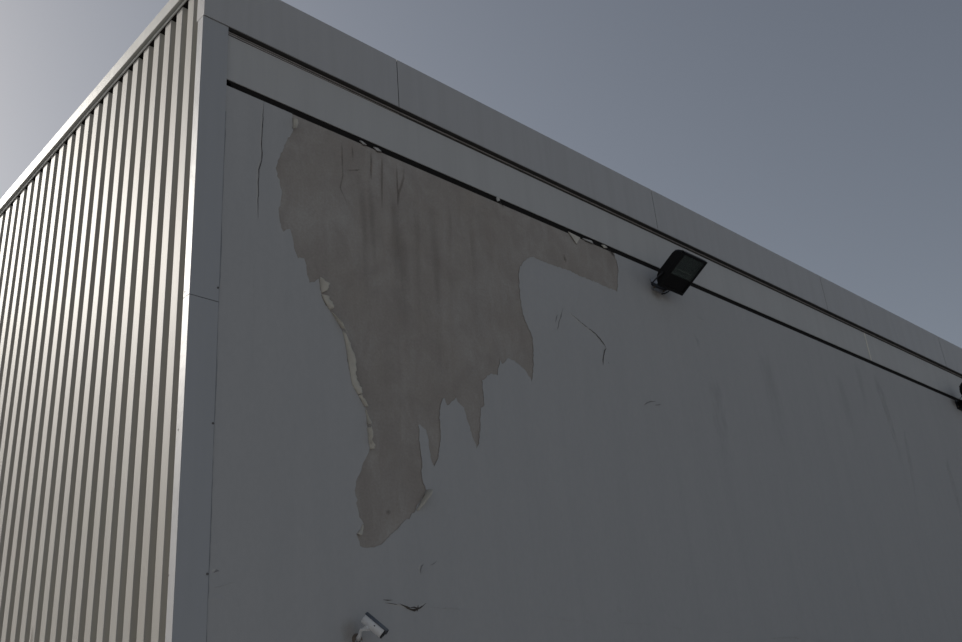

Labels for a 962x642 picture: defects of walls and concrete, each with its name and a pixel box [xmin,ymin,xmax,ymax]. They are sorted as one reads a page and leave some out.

peeling [274,114,619,548]
crack [386,600,426,612]